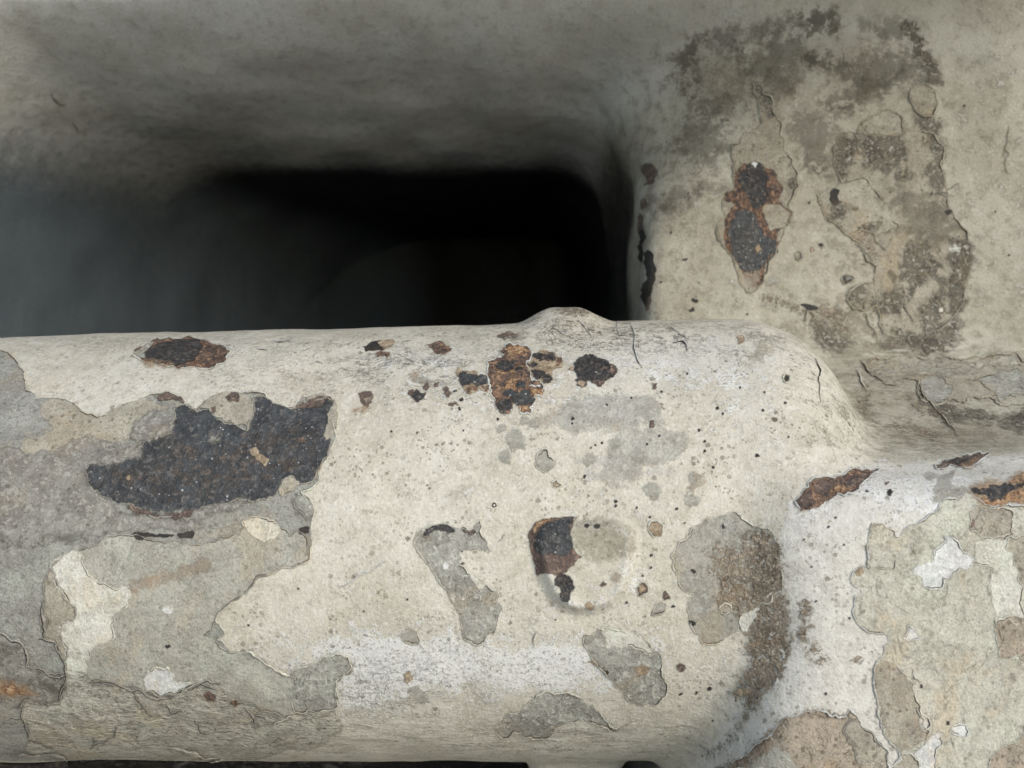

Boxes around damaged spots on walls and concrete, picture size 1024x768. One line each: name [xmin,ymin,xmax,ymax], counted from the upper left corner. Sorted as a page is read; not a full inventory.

damp [901,20,944,85]
rust [715,81,800,293]
peeling [808,83,1024,407]
rust [133,335,232,370]
rust [408,331,618,416]
crack [815,358,823,402]
crack [857,313,961,436]
crack [976,352,1016,380]
rust [794,467,880,514]
peeling [0,349,353,768]
peeling [413,519,503,646]
peeling [714,471,1024,768]